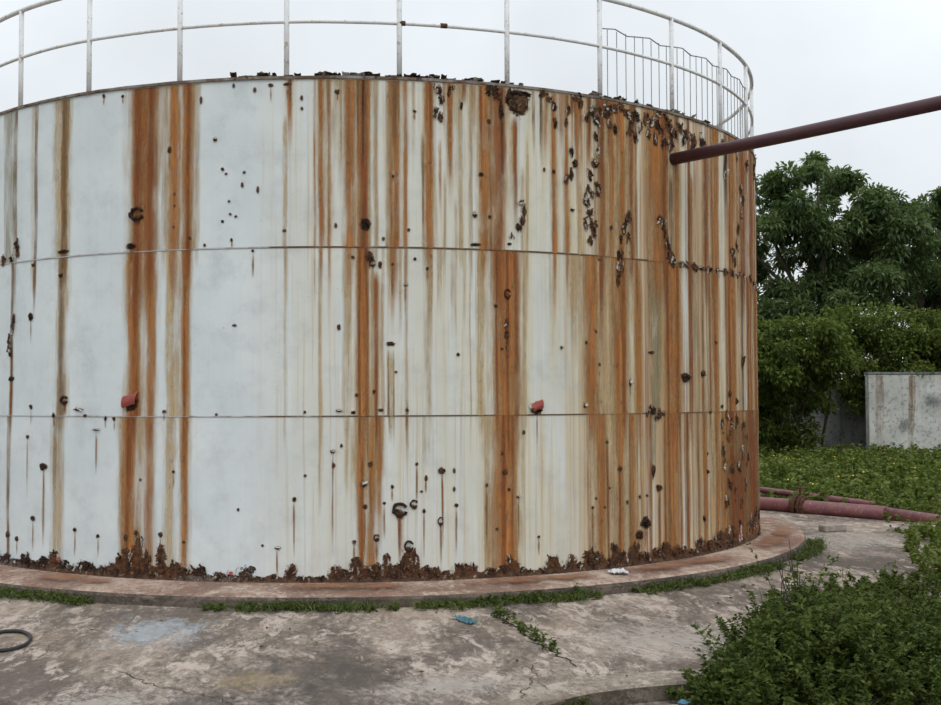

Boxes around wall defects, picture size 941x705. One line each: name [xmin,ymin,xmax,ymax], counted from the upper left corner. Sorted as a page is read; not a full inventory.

corrosion [0,79,792,588]